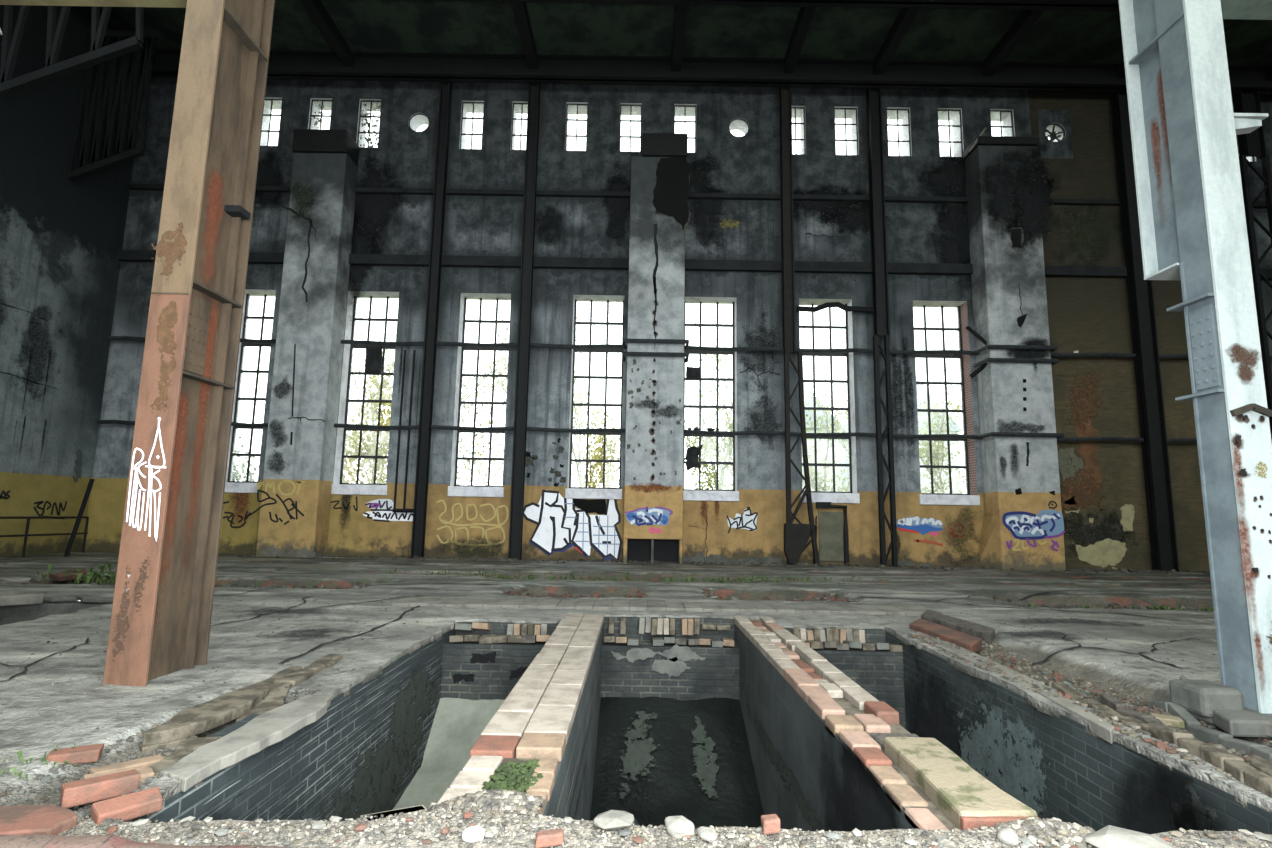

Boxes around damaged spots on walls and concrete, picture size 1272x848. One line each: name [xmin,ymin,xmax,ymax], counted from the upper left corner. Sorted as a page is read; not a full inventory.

spalling [653,157,691,231]
crack [651,224,659,349]
water stain [19,306,61,399]
rust [1230,344,1258,382]
rust [150,301,217,542]
flaking render [1049,392,1102,523]
peeling [1075,504,1135,569]
rust [1232,414,1272,595]
crack [0,638,89,682]
crack [214,583,479,663]
crack [857,591,1192,668]
rust [1255,622,1272,678]